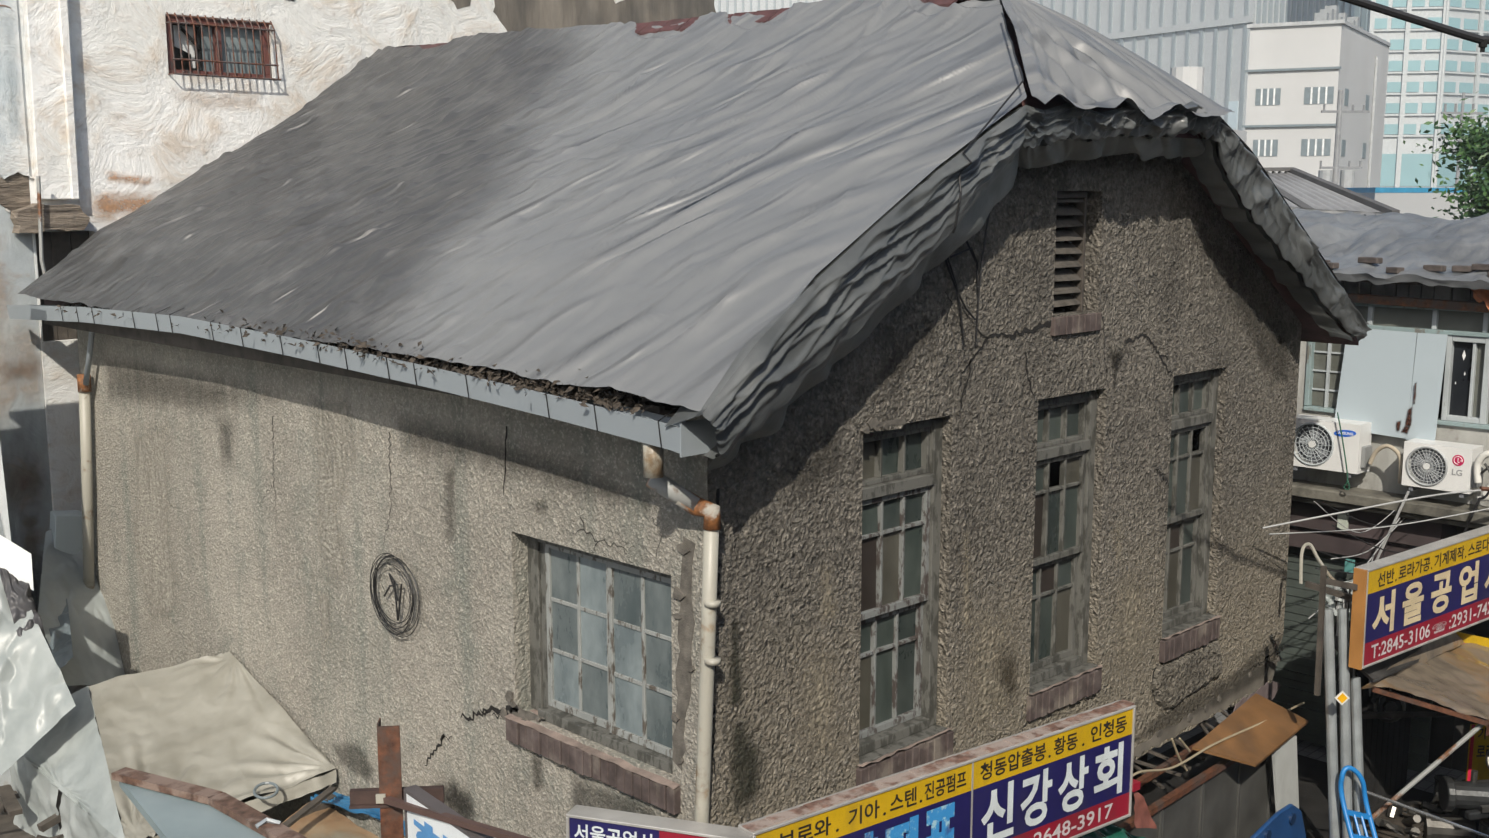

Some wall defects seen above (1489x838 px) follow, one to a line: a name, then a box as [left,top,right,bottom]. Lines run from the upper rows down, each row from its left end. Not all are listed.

flaking render [0,172,31,213]
crack [945,292,1051,415]
crack [1102,316,1173,386]
damp [318,406,352,575]
damp [444,786,472,819]